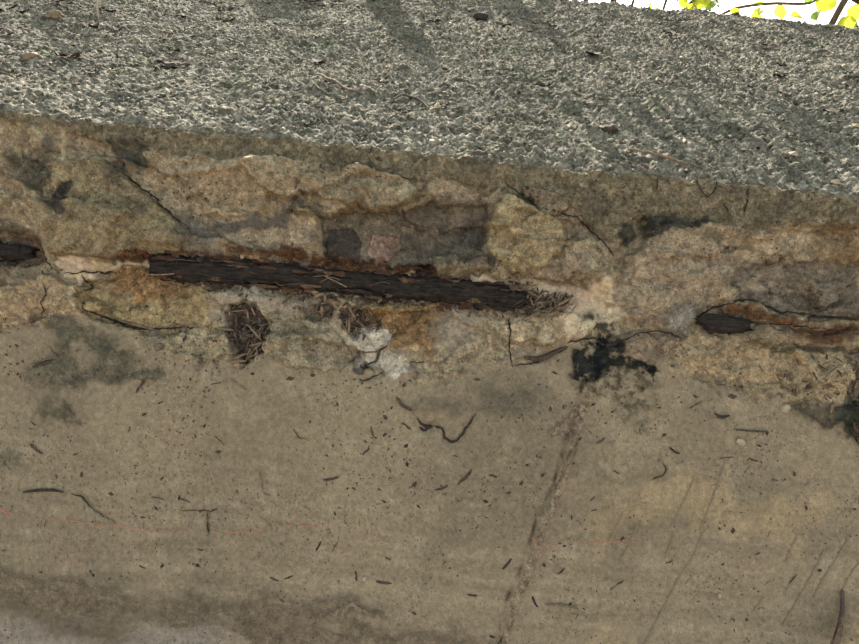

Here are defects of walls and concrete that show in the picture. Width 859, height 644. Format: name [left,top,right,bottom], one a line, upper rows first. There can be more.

rust [0,229,47,265]
rust [110,243,521,352]
spalling [0,117,654,385]
mould [571,314,659,389]
spalling [605,221,859,413]
rust [719,303,859,344]